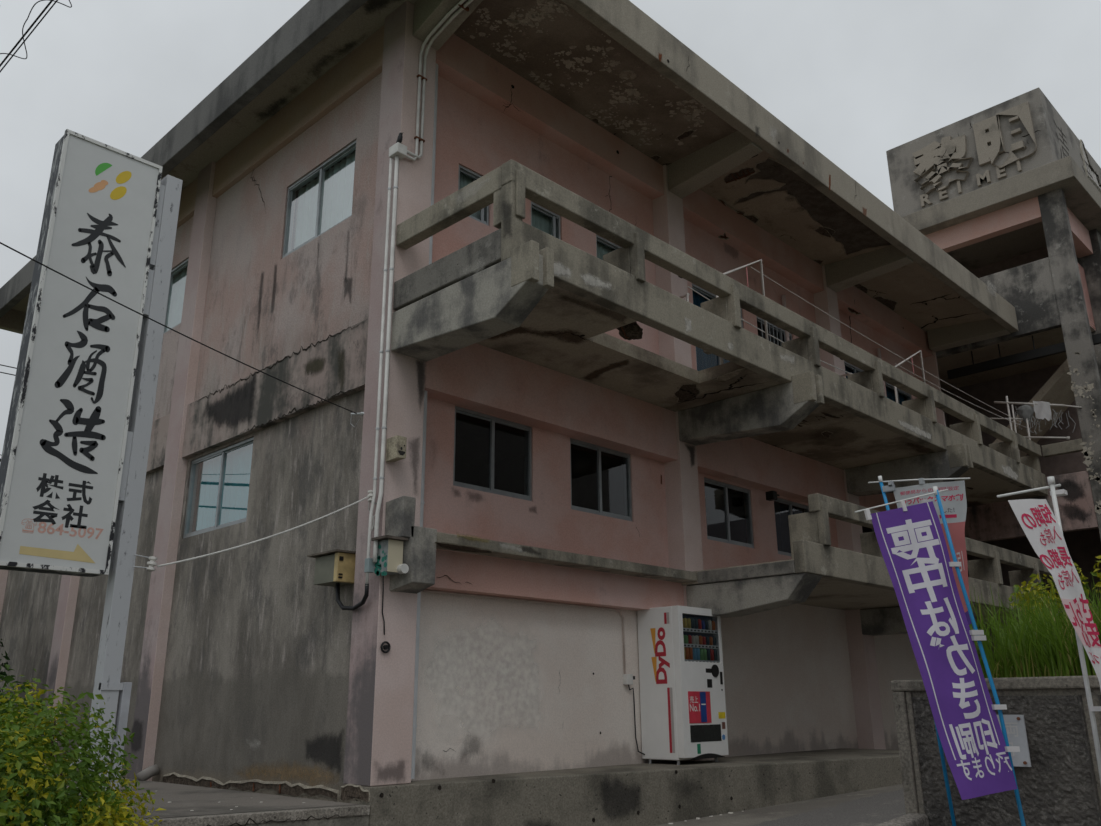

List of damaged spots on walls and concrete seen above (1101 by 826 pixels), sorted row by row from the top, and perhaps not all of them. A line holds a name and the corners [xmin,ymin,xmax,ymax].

peeling [463,0,707,165]
peeling [718,157,892,255]
peeling [1080,139,1101,193]
damp [206,375,256,428]
peeling [1067,352,1101,484]
spalling [163,772,371,803]